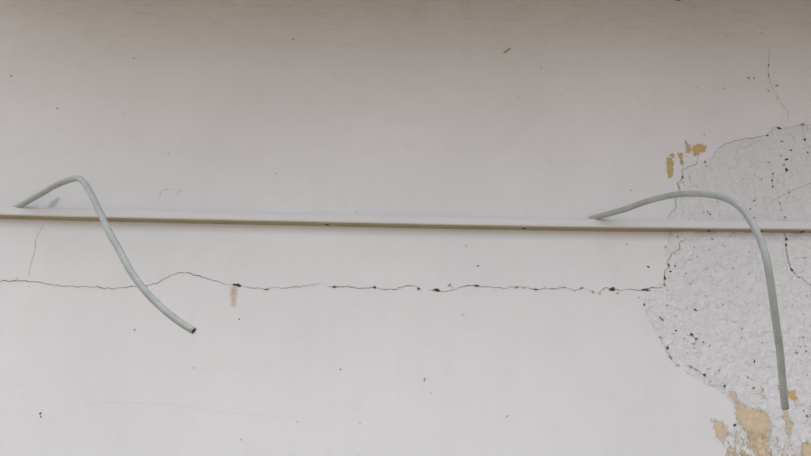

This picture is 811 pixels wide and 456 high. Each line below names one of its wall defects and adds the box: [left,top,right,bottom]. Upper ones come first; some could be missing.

crack [324,64,811,294]
peeling [665,134,707,178]
peeling [710,387,811,456]